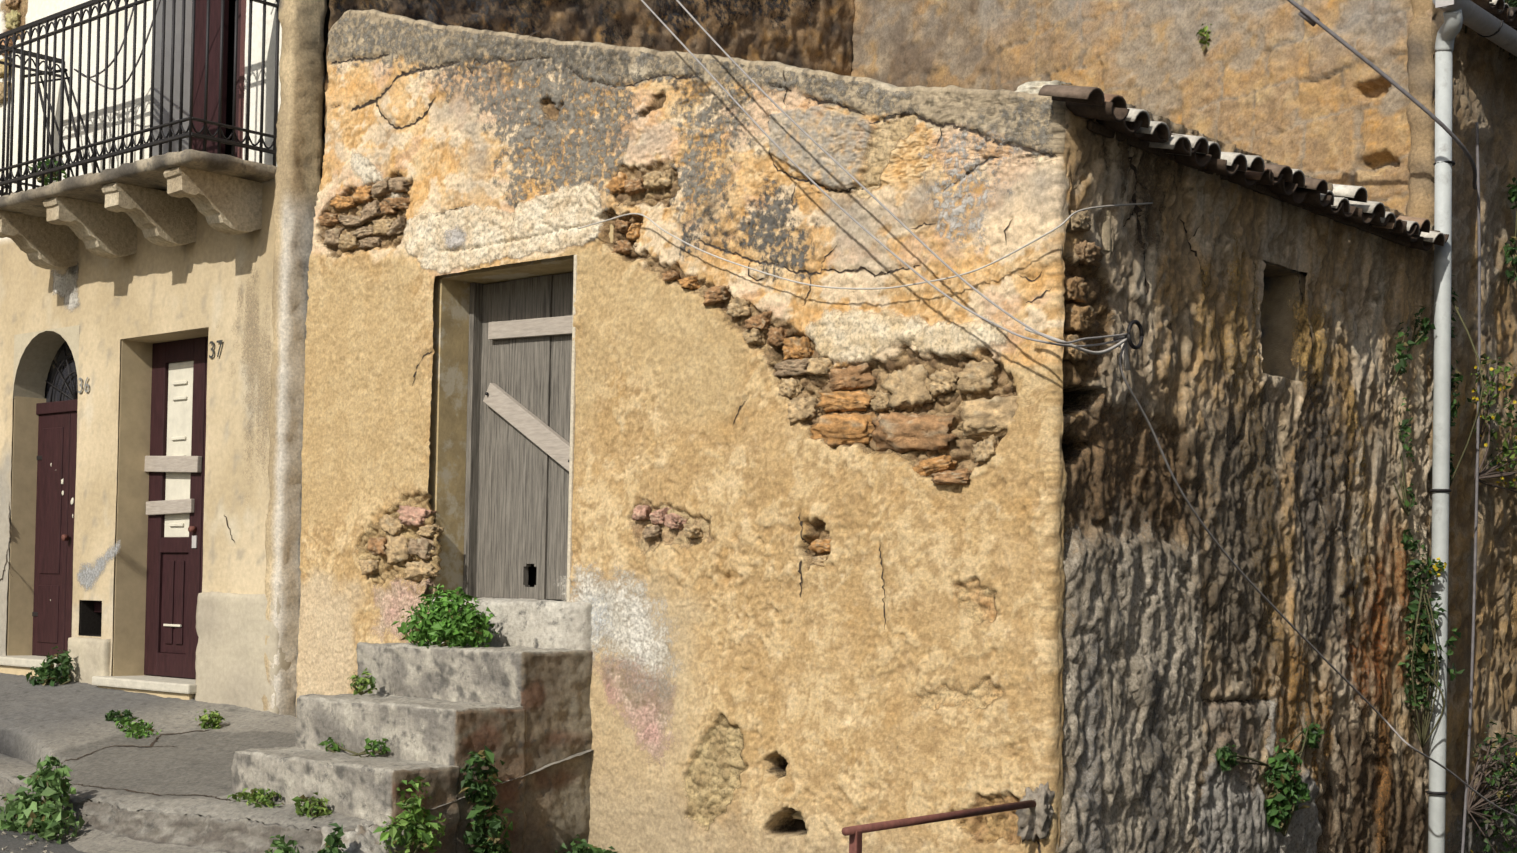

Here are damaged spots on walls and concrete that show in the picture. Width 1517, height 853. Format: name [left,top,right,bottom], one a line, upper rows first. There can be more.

crack [331,26,703,129]
leakage [328,0,920,281]
spalling [317,171,413,258]
spalling [603,159,1018,485]
spalling [357,491,444,586]
spalling [629,499,715,555]
leakage [1057,241,1371,853]
spalling [769,757,788,777]
spalling [771,809,807,834]